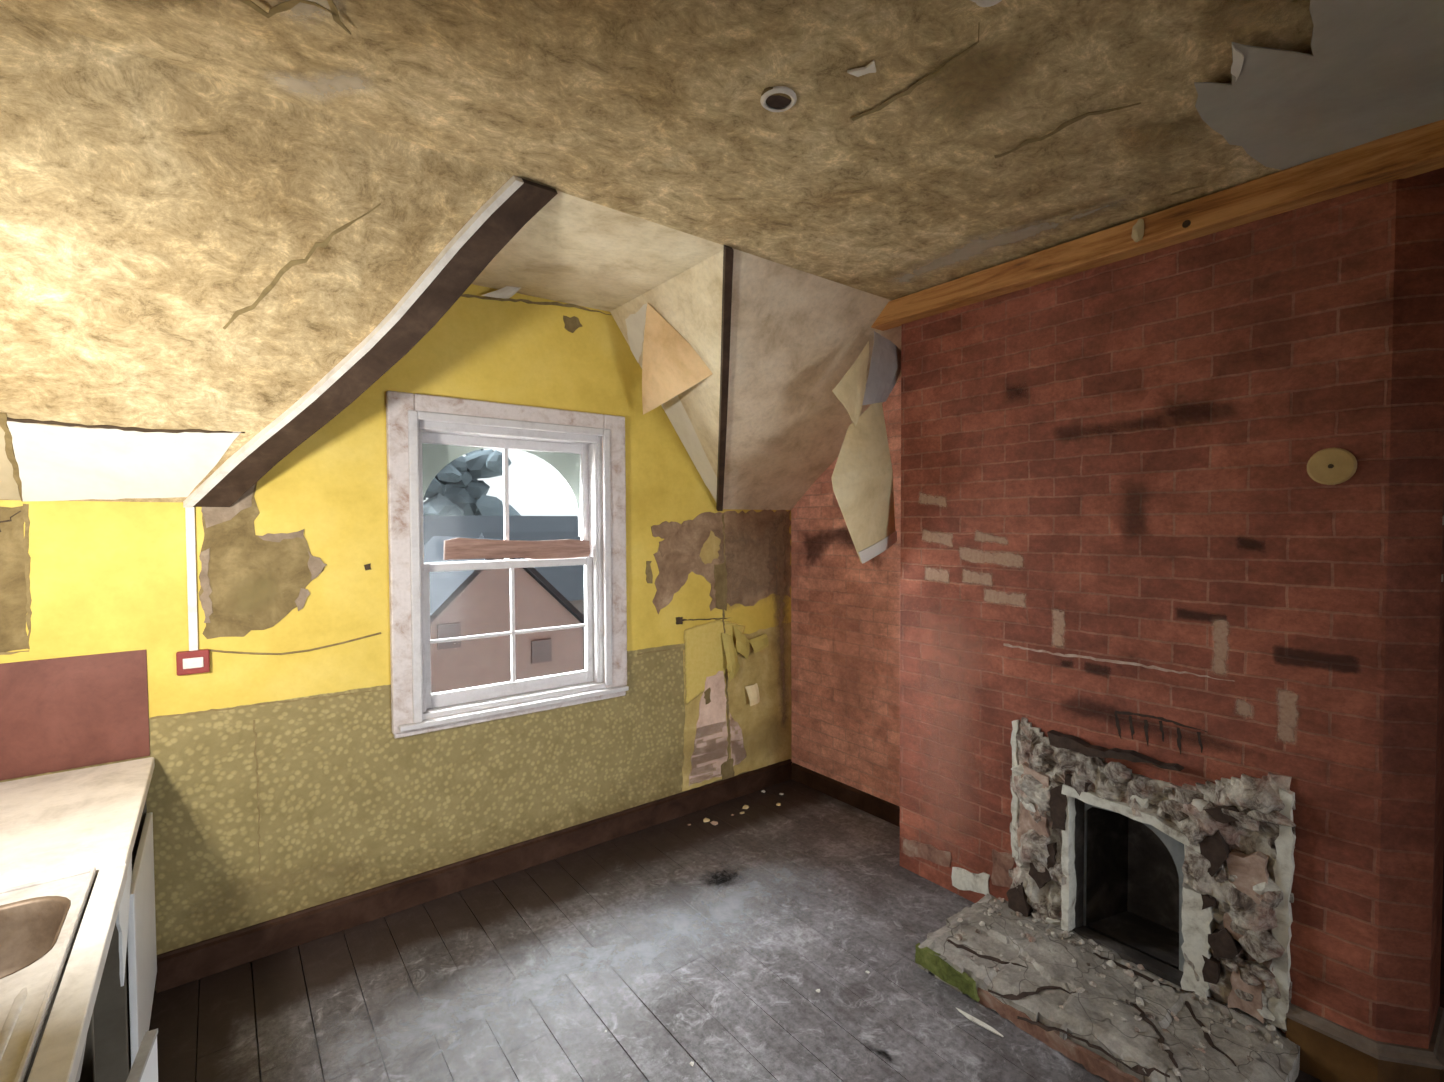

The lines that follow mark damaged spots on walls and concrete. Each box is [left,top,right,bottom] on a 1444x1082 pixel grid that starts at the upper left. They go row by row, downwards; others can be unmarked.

crack [850,22,980,121]
crack [223,203,381,329]
flaking render [0,504,32,655]
spalling [199,482,327,639]
peeling [645,509,792,633]
flaking render [689,650,746,786]
spalling [1047,730,1184,771]
flaking render [1199,806,1270,904]
crack [947,939,1241,1082]